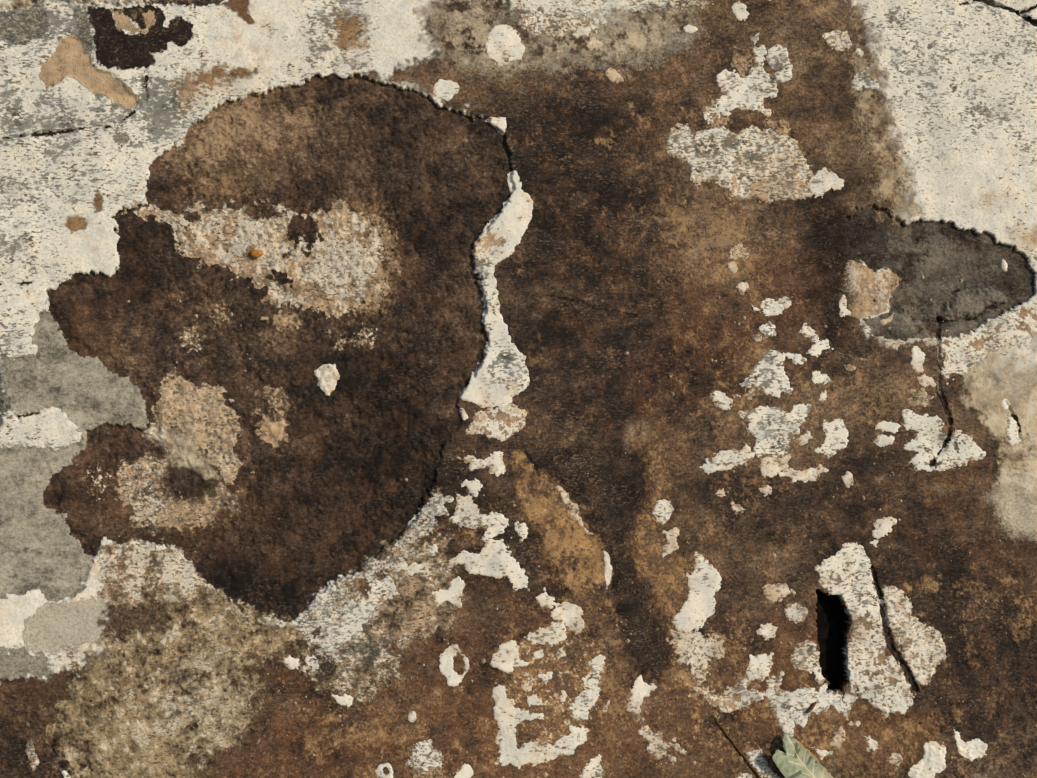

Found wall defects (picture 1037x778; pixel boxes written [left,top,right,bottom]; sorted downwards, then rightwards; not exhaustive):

damp [414,0,510,73]
damp [485,0,682,79]
crack [959,0,1037,27]
peeling [699,240,849,497]
spalling [839,203,1037,472]
crack [929,289,998,466]
damp [958,356,1037,545]
peeling [666,517,948,760]
crack [871,566,920,692]
damp [0,666,101,778]
peeling [626,675,687,765]
peeling [888,729,988,778]